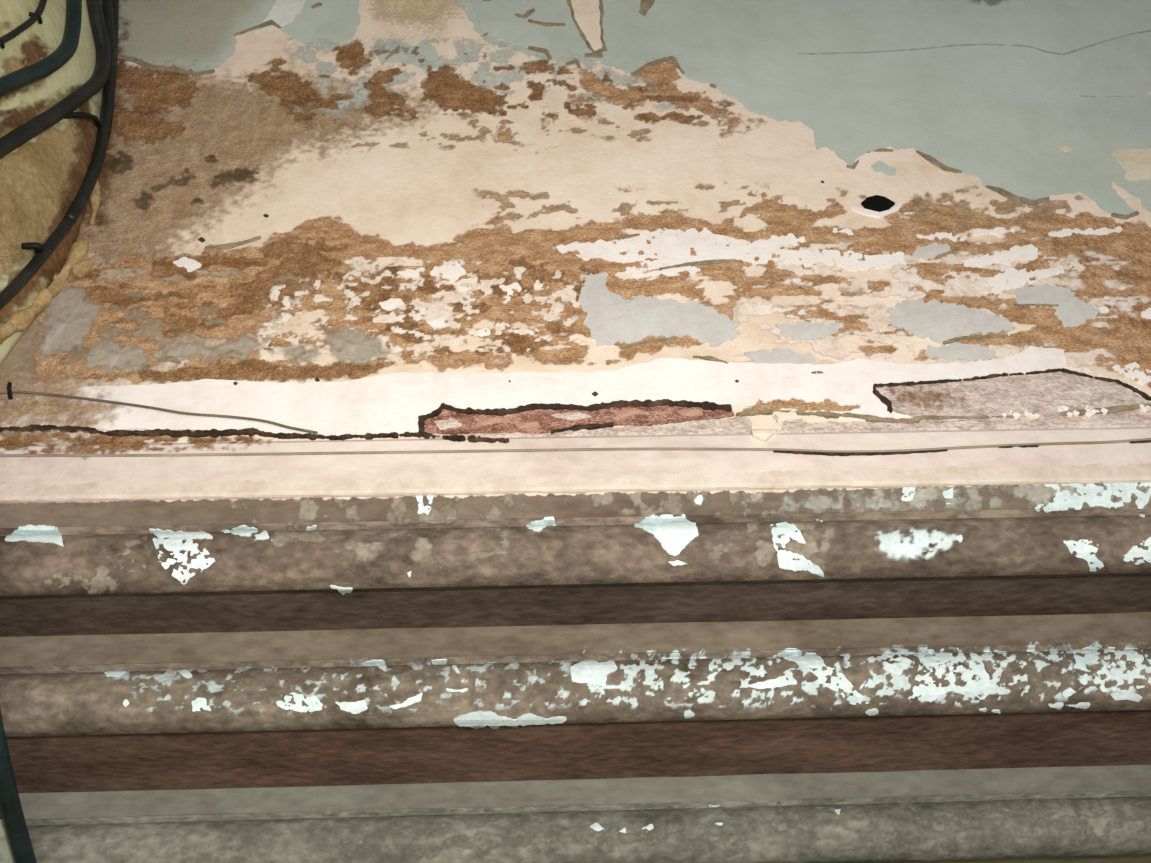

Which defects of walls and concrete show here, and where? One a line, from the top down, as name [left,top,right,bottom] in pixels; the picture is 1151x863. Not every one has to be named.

peeling [0,0,1151,440]
peeling [0,430,111,445]
peeling [129,430,329,443]
crack [0,424,509,454]
crack [736,409,1014,443]
peeling [0,463,1151,595]
peeling [104,642,1151,729]
spalling [0,819,16,863]